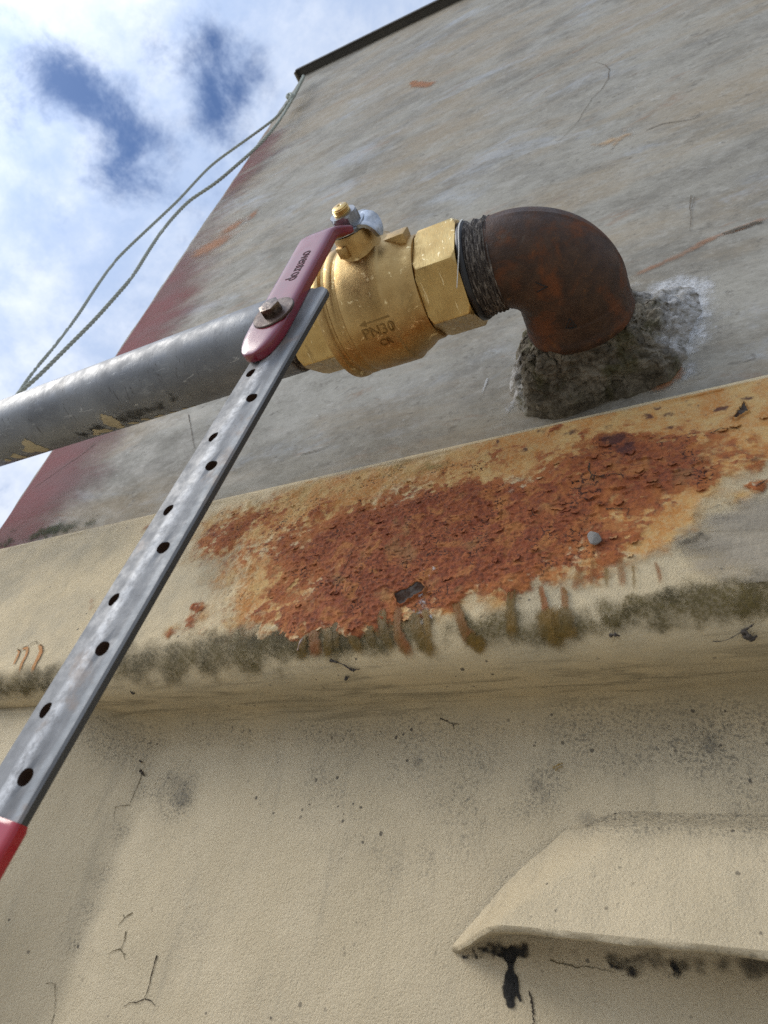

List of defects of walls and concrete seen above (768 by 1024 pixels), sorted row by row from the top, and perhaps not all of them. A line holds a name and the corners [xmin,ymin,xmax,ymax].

damp [657,276,712,352]
corrosion [13,641,43,671]
corrosion [377,608,434,656]
corrosion [452,602,485,654]
corrosion [505,590,517,634]
corrosion [537,559,635,647]
crack [125,955,158,1006]
damp [462,943,528,1008]